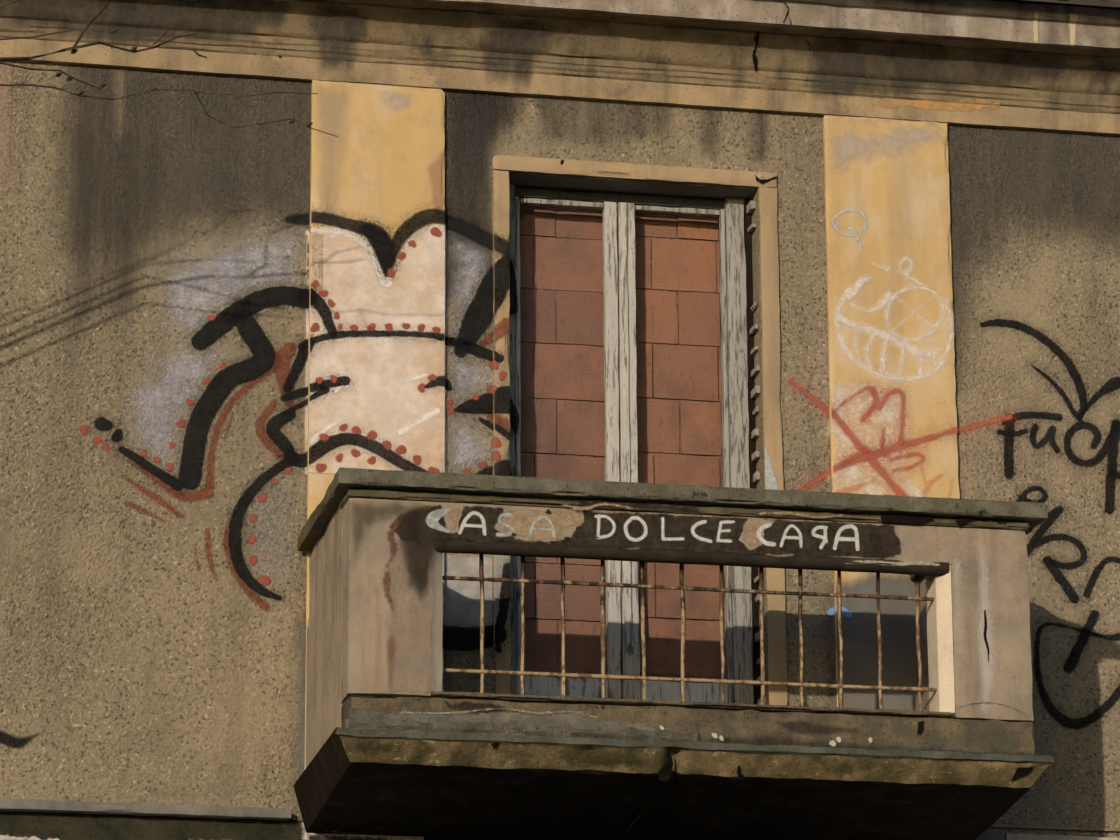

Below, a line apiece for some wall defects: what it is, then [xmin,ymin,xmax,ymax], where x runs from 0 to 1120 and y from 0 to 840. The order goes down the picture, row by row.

water stain [0,0,287,41]
water stain [315,7,362,67]
water stain [487,19,552,80]
crack [752,2,815,80]
water stain [814,11,1064,94]
water stain [1069,13,1079,46]
water stain [77,66,312,242]
crack [982,610,990,661]